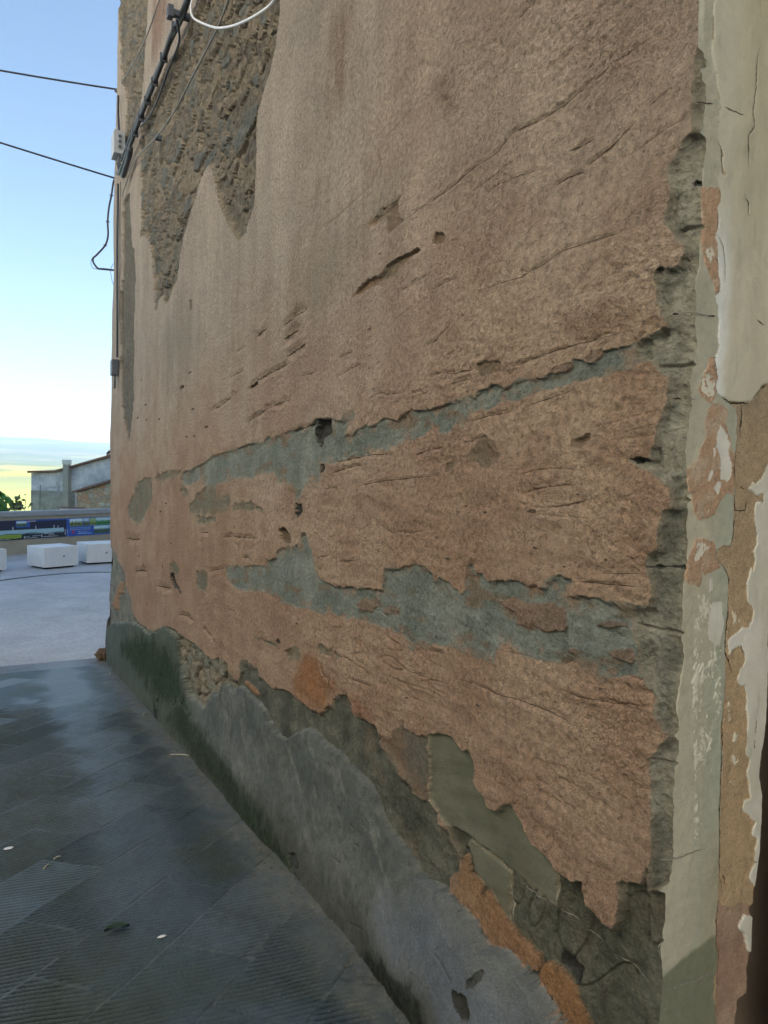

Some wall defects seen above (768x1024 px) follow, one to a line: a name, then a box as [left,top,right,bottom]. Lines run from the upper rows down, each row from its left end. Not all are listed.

spalling [118,0,280,440]
crack [372,12,684,220]
crack [487,226,634,288]
spalling [127,477,153,525]
spalling [155,0,768,1024]